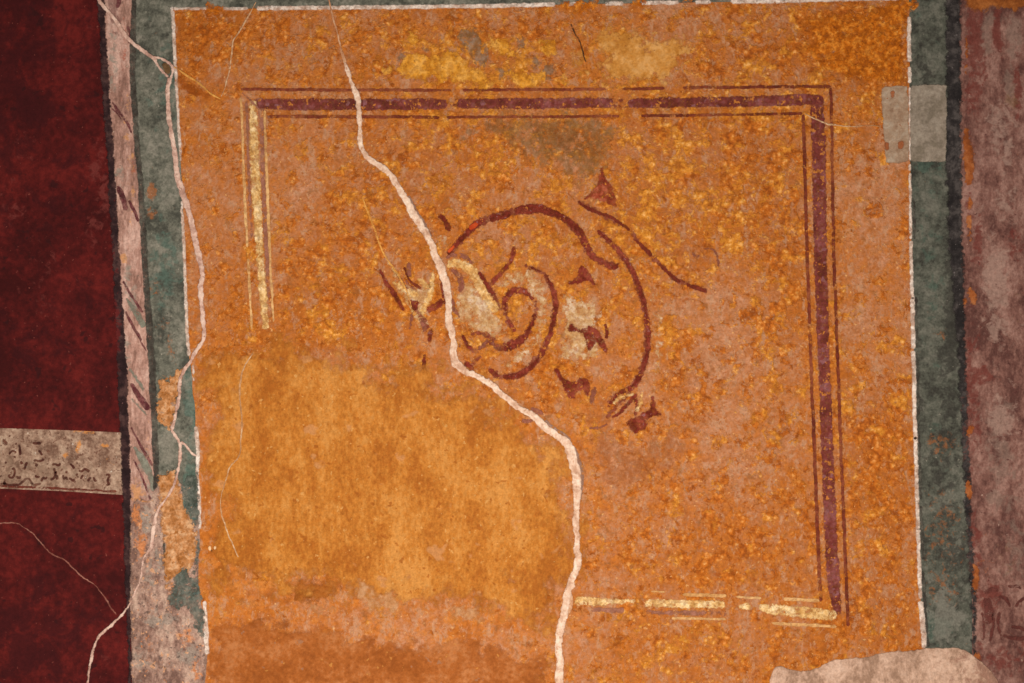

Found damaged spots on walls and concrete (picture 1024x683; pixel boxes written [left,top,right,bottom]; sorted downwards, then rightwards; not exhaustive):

crack [0,0,256,683]
peeling [156,368,183,431]
peeling [129,470,216,683]
crack [328,0,584,683]